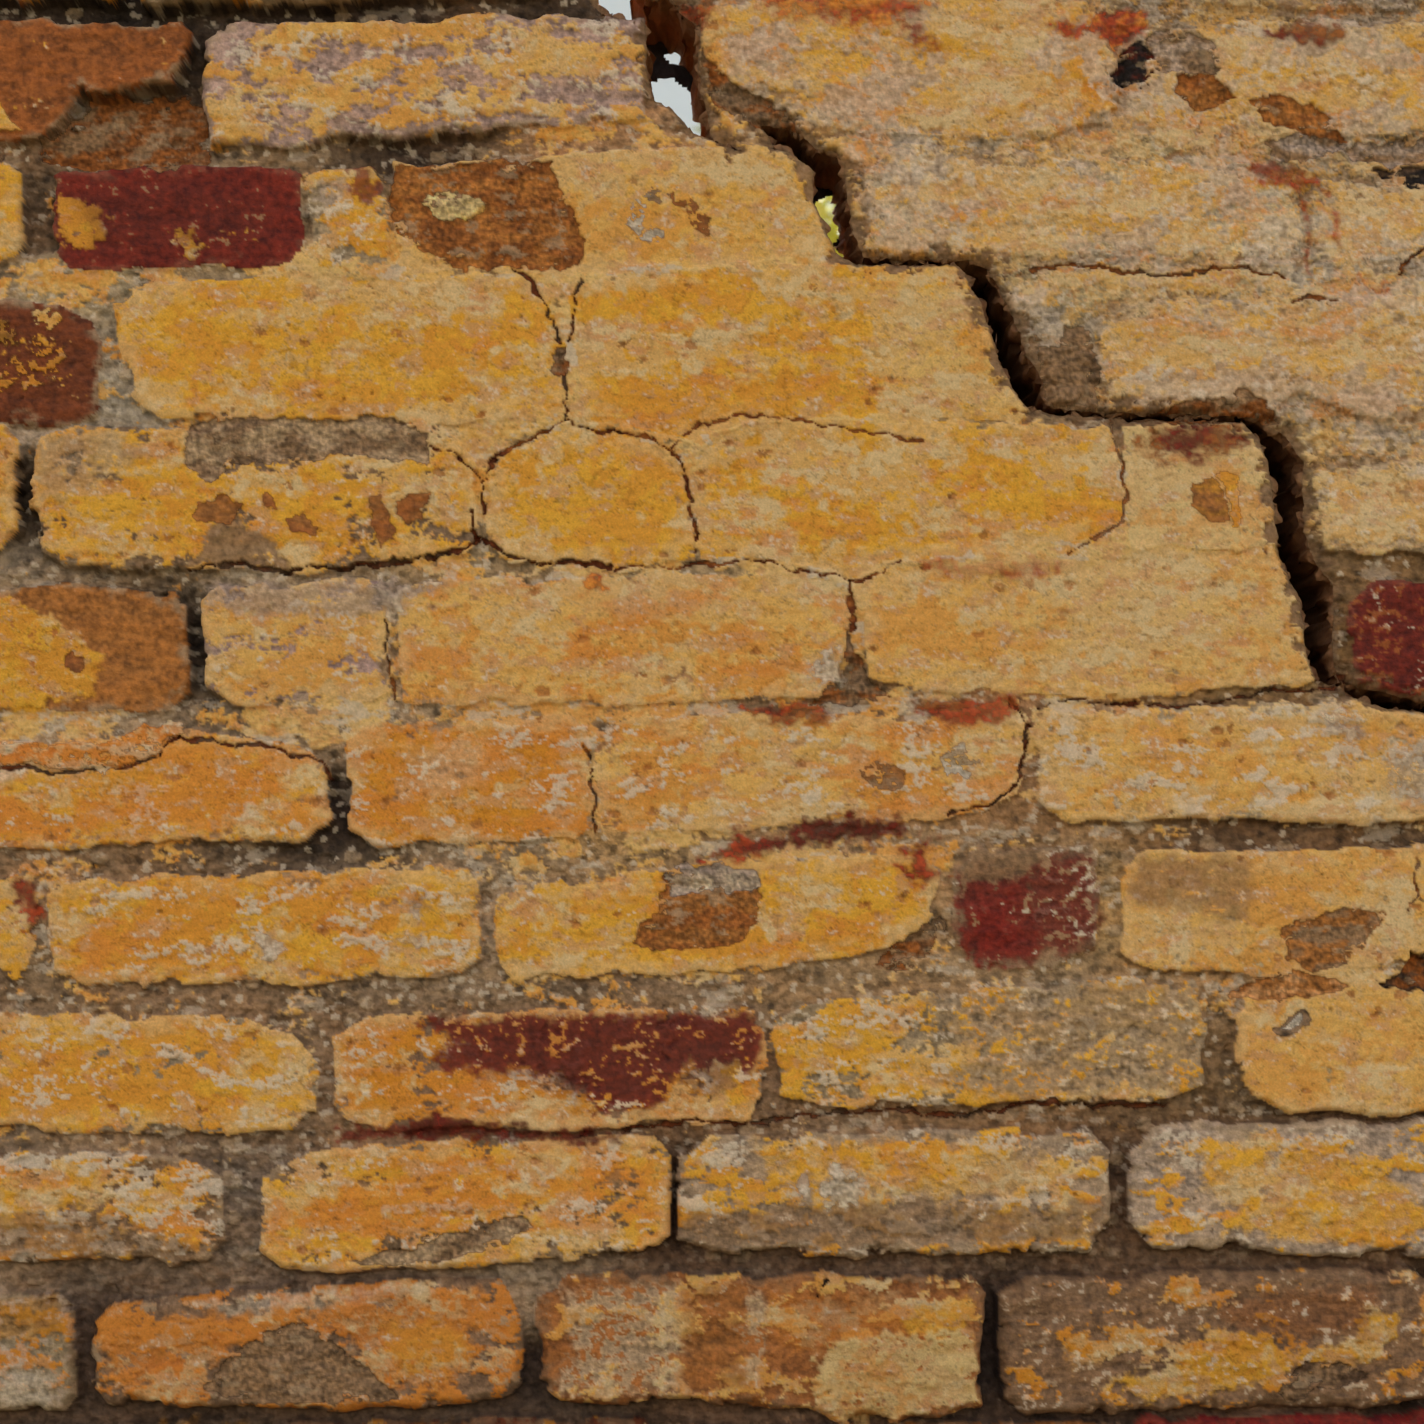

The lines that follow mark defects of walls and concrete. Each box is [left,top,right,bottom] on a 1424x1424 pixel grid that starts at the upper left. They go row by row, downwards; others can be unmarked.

crack [597,0,1424,816]
spalling [633,861,762,951]